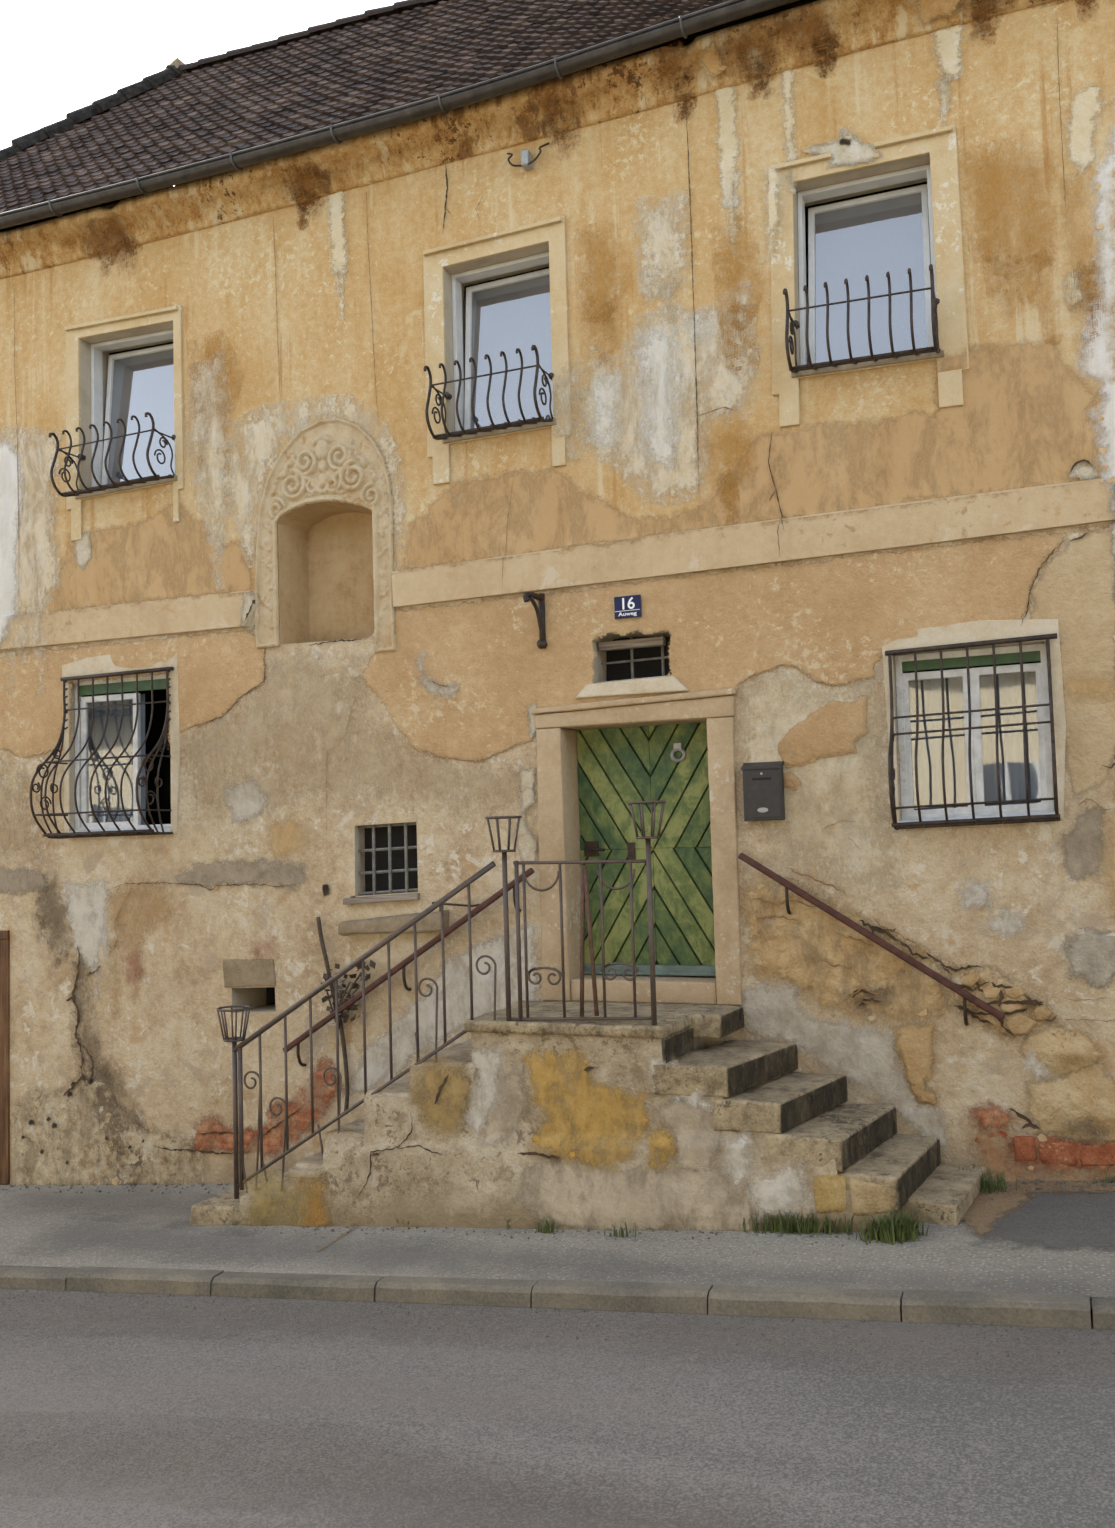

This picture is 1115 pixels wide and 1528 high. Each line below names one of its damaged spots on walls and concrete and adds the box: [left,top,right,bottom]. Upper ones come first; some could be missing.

flaking render [802,127,882,168]
water stain [81,215,139,269]
water stain [282,158,348,321]
water stain [0,443,50,693]
crack [1020,533,1087,626]
flaking render [1030,529,1115,881]
flaking render [515,765,537,861]
flaking render [734,671,958,1105]
crack [66,882,304,1087]
flaking render [12,1056,343,1185]
peeling [523,1049,676,1169]
flaking render [969,1102,1115,1182]